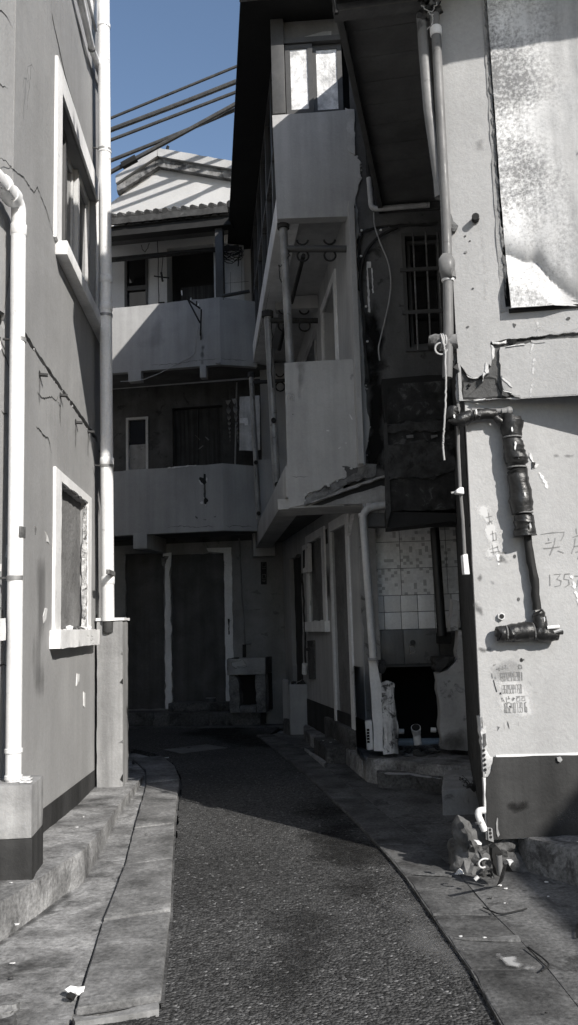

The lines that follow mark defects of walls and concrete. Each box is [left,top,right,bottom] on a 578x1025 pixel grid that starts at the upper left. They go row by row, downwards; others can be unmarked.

spalling [453,333,578,403]